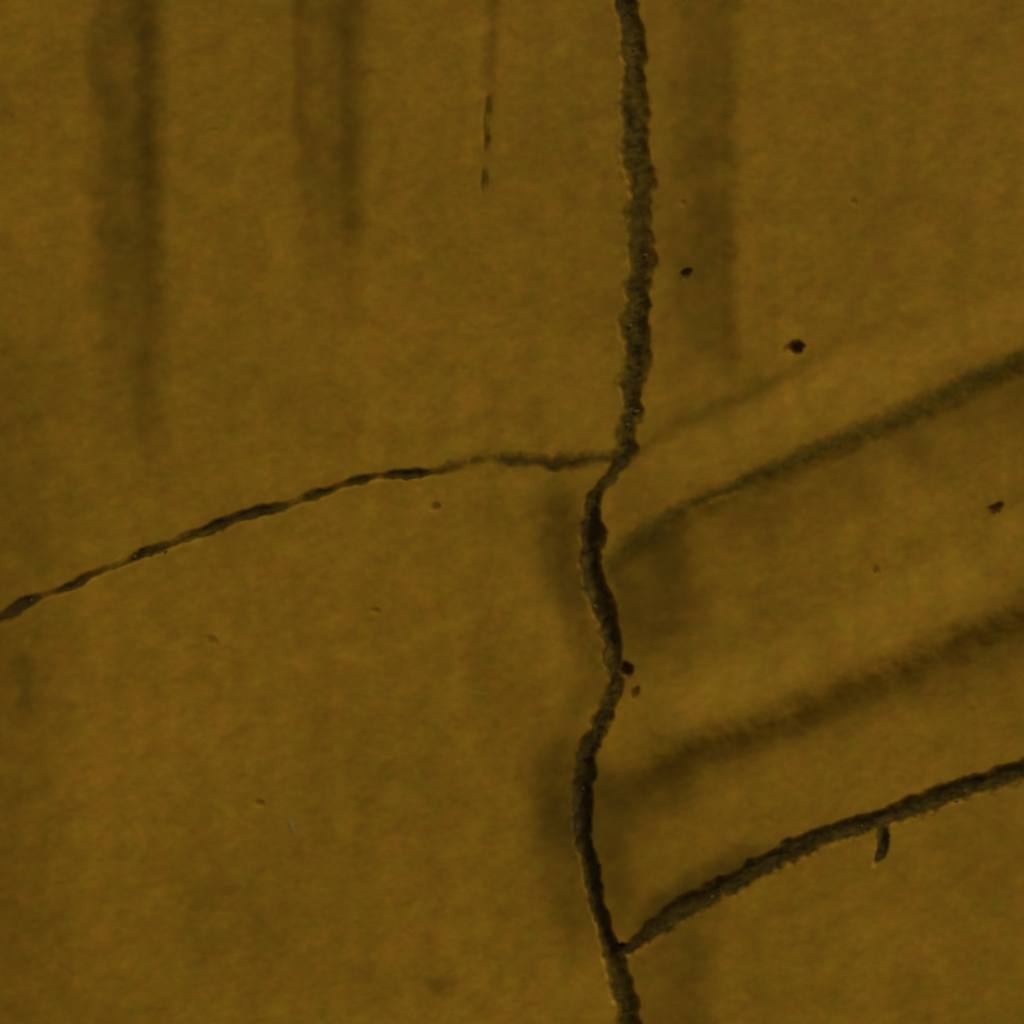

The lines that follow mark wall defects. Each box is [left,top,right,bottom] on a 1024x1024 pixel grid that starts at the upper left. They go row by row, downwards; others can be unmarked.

crack [0,460,474,621]
crack [500,0,1024,1024]